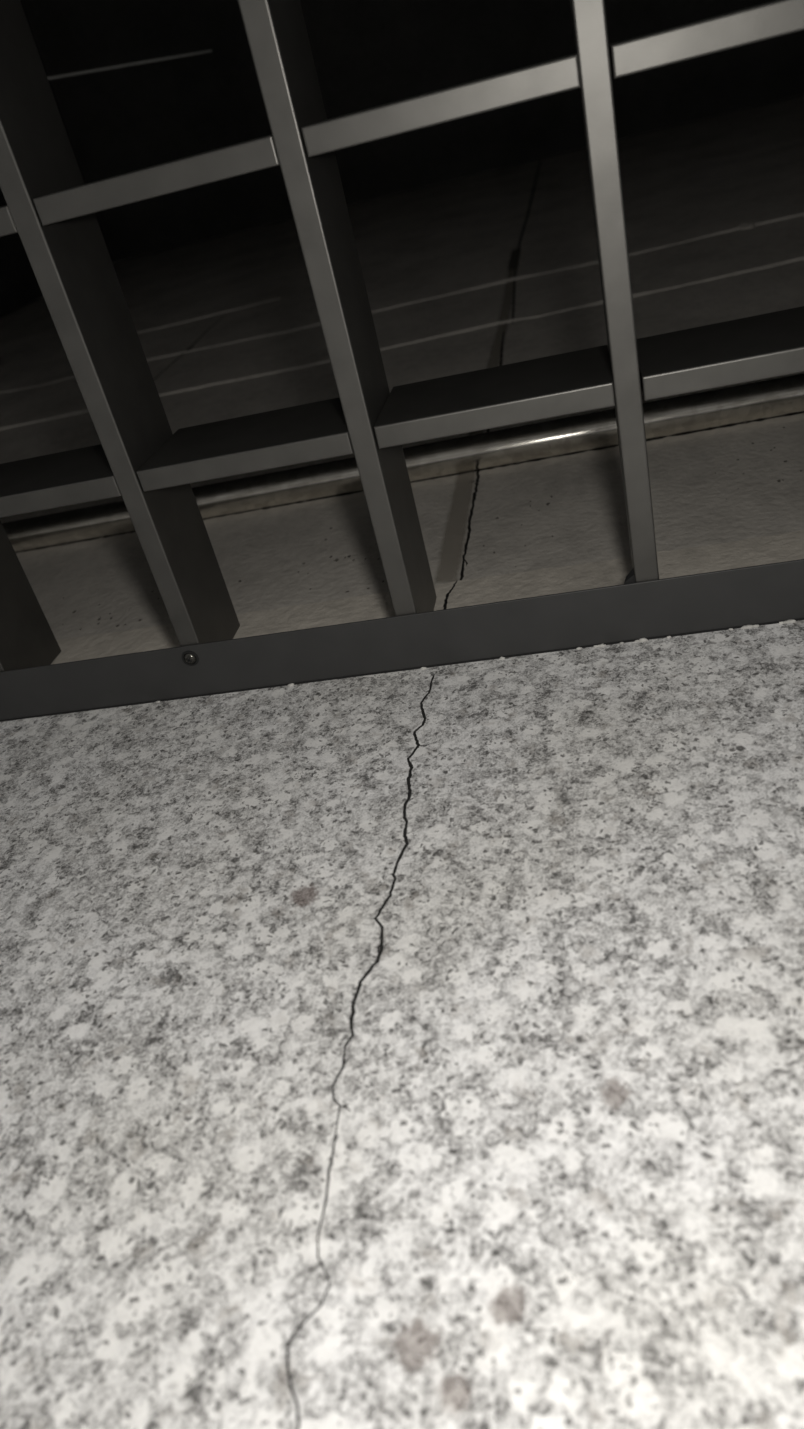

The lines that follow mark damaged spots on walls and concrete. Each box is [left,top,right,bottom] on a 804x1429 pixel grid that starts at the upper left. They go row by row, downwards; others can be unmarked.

crack [499,161,541,366]
crack [286,676,434,1429]